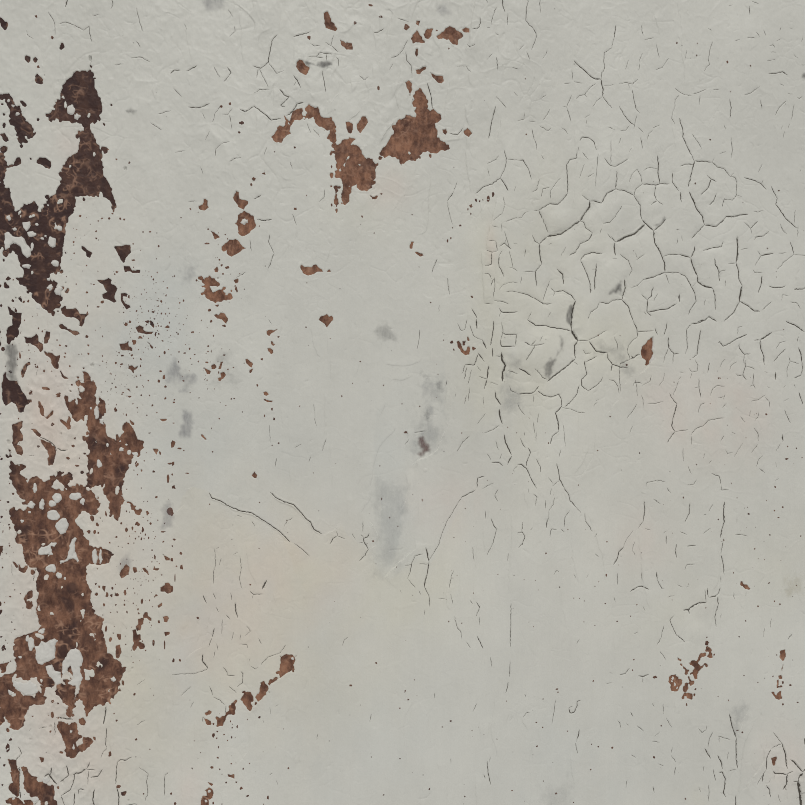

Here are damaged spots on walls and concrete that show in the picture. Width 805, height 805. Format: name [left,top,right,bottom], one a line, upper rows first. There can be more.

peeling [411,21,469,56]
peeling [272,81,450,213]
peeling [0,65,116,336]
peeling [211,191,256,257]
peeling [97,278,130,309]
peeling [0,307,159,758]
crack [209,492,369,561]
crack [172,547,285,721]
peeling [205,654,295,727]
peeling [5,759,59,805]
crack [699,715,738,805]
crack [758,733,805,805]